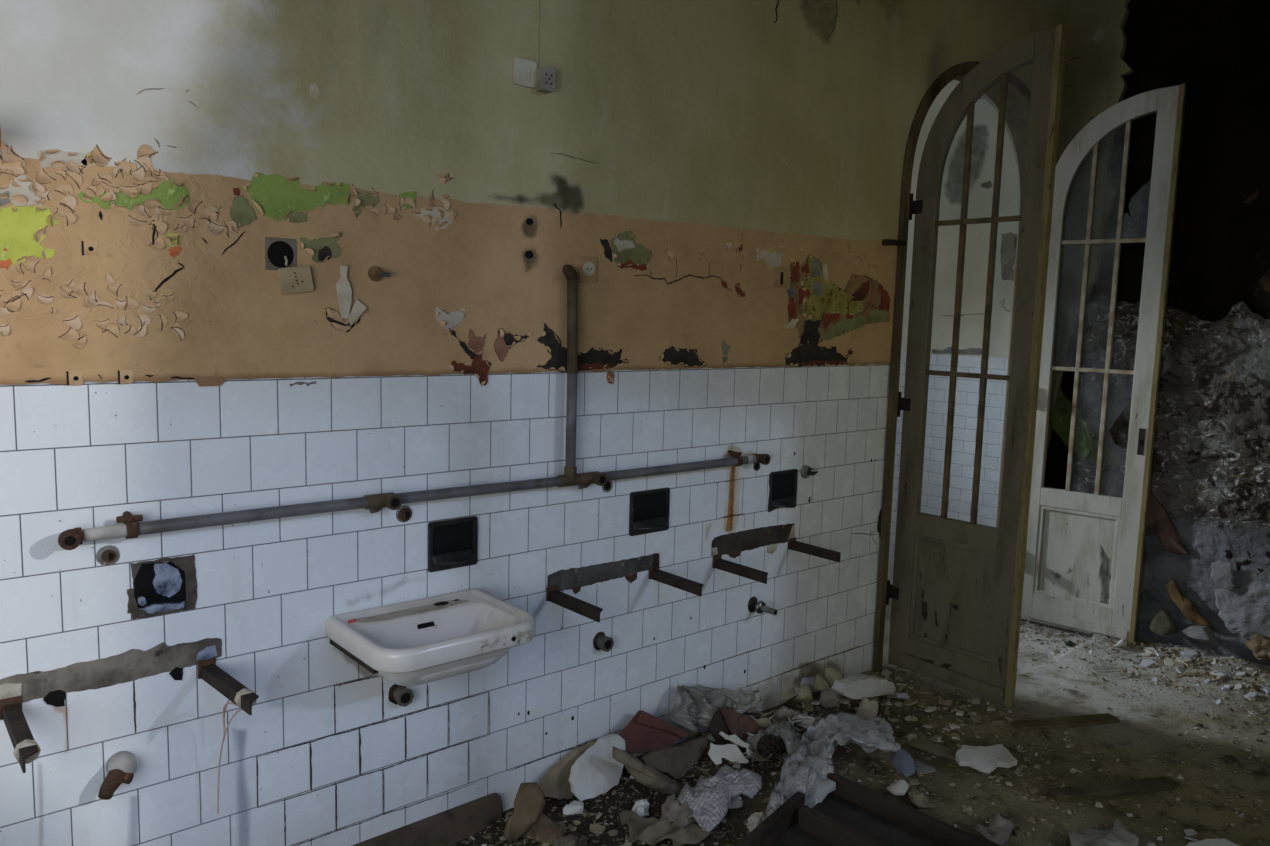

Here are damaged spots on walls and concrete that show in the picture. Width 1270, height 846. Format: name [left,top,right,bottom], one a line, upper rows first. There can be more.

water stain [542,177,581,211]
peeling [0,141,456,349]
peeling [436,307,629,386]
peeling [600,230,651,271]
peeling [659,346,707,367]
crack [634,259,742,291]
peeling [738,245,890,367]
flaking render [1044,112,1157,497]
spalling [1122,0,1270,666]
corrosion [722,466,744,531]
hole [134,562,186,609]
spalling [0,638,222,707]